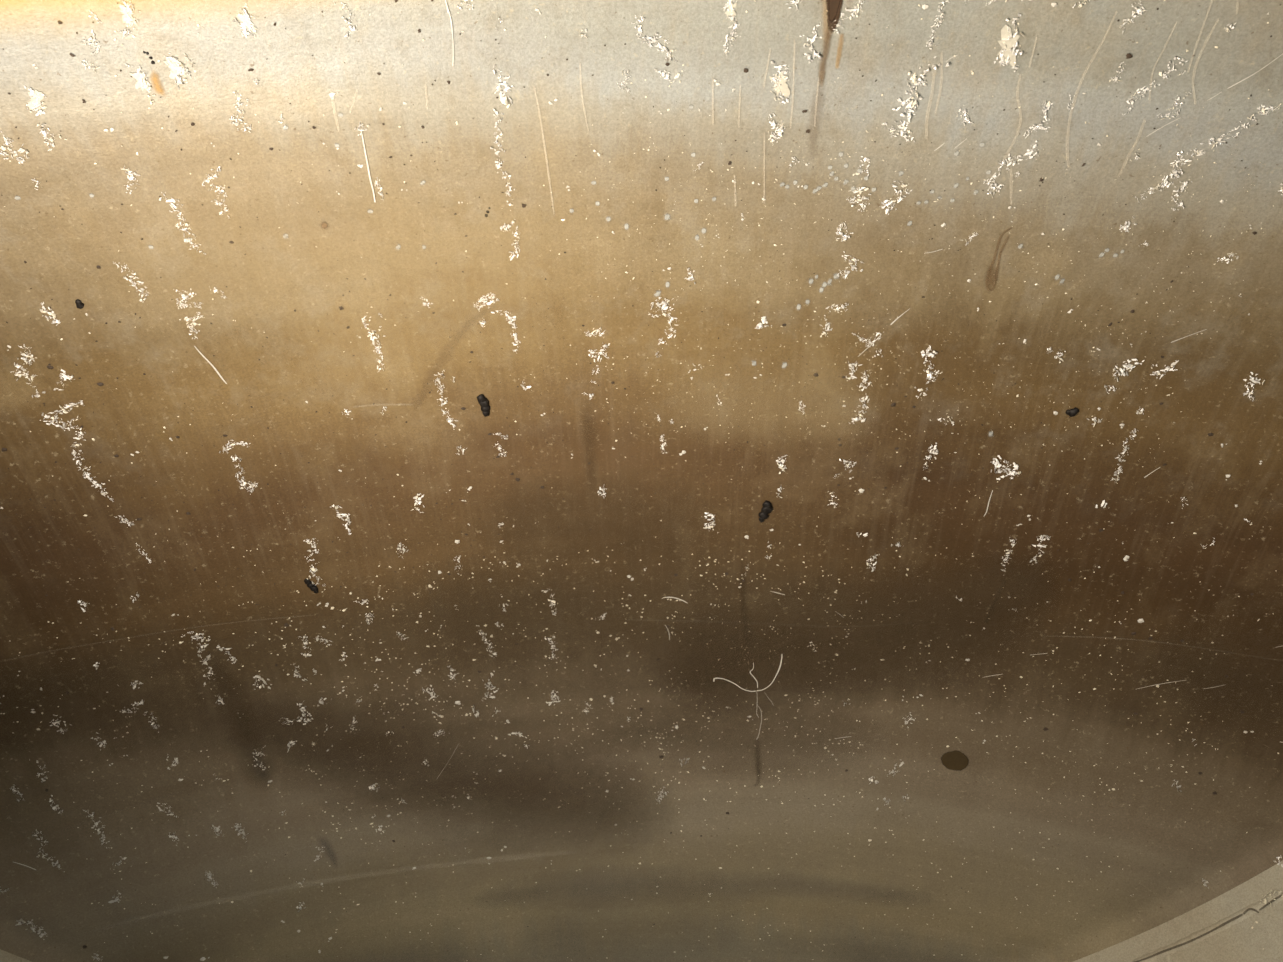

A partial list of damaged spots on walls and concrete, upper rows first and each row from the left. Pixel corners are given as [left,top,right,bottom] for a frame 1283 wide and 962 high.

rust [819,0,843,82]
leakage [361,130,376,213]
leakage [780,153,876,193]
leakage [692,575,1032,677]